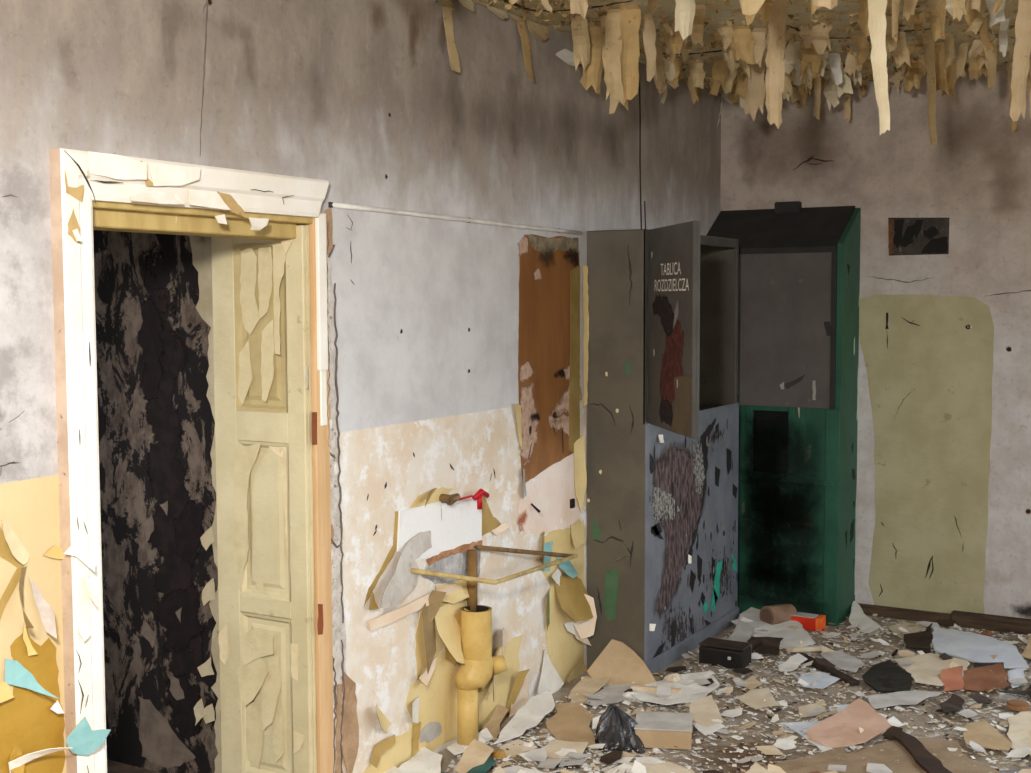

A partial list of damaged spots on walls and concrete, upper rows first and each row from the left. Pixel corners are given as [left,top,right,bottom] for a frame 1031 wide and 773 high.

peeling [64,151,269,243]
peeling [434,0,1031,147]
peeling [324,208,597,773]
peeling [0,520,111,773]